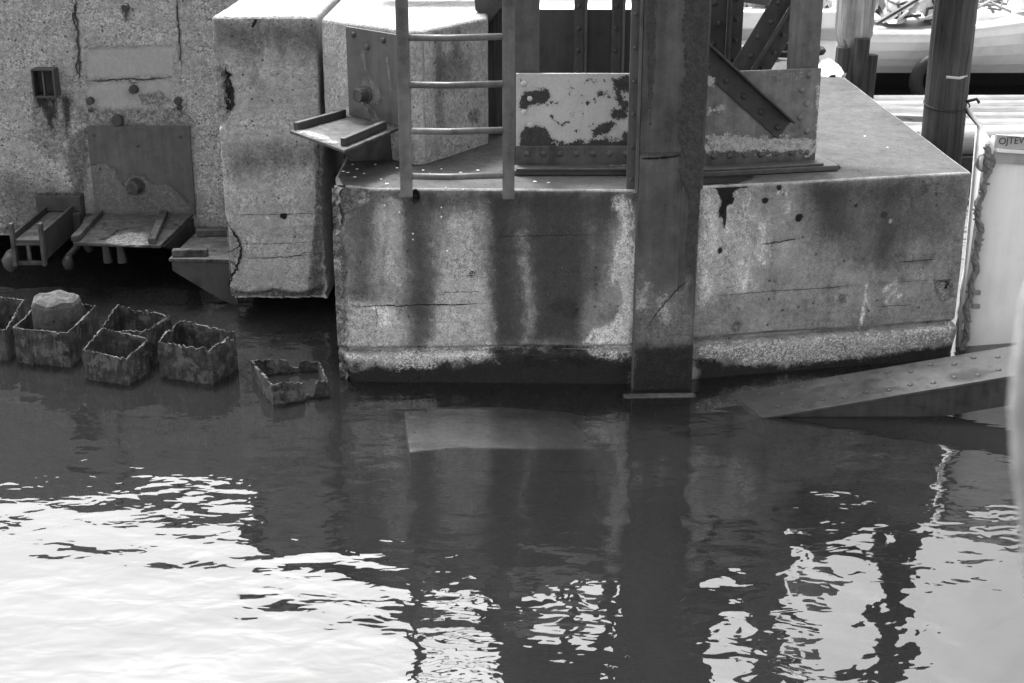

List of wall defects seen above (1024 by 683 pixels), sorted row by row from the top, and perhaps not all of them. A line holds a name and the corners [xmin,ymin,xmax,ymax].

crack [72,1,182,84]
crack [225,67,233,113]
peeling [519,75,629,146]
spalling [31,91,194,213]
crack [226,213,314,285]
leakage [341,298,406,353]
leakage [376,198,403,286]
crack [348,291,486,324]
leakage [428,195,635,349]
crack [646,281,687,329]
leakage [696,188,771,307]